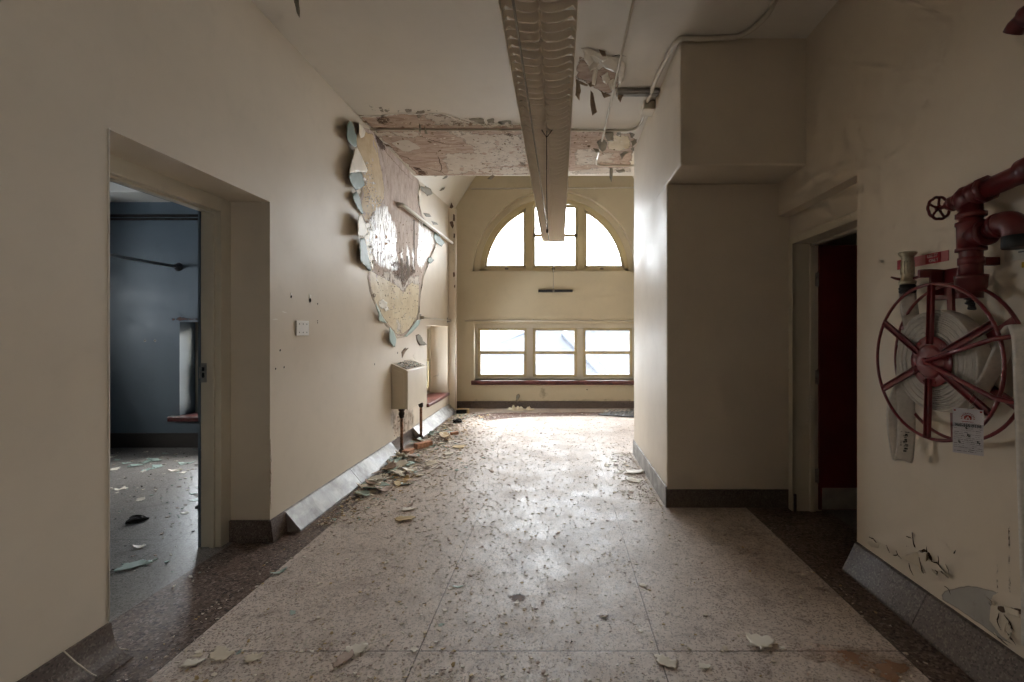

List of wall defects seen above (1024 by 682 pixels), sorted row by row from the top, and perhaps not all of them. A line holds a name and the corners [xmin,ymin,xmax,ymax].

peeling [575,48,626,115]
peeling [569,128,637,182]
peeling [346,105,530,358]